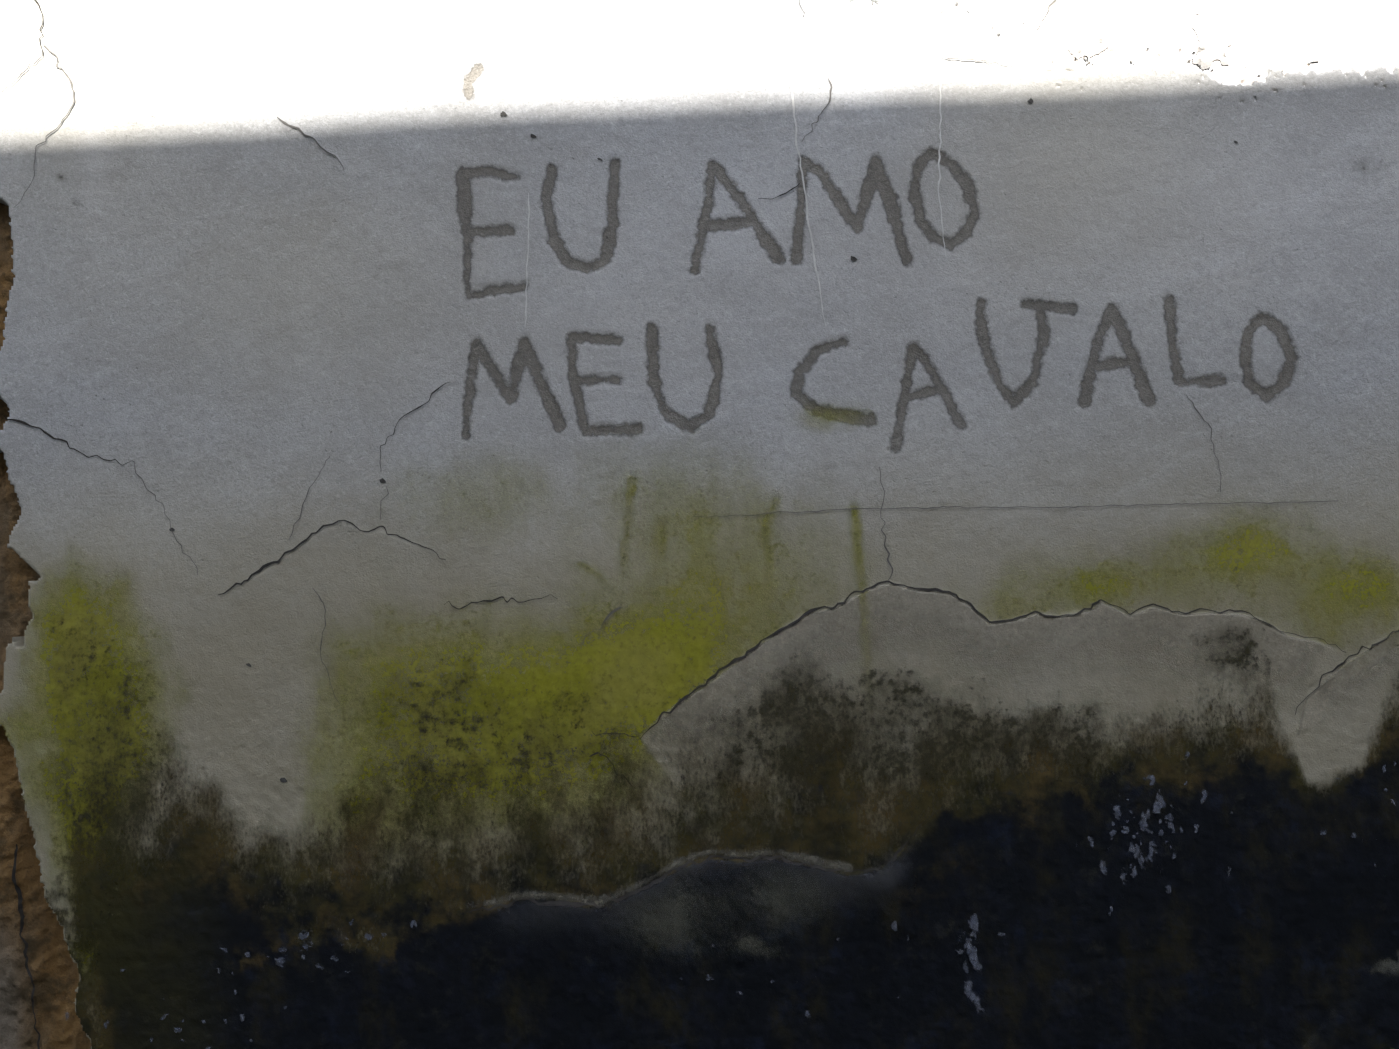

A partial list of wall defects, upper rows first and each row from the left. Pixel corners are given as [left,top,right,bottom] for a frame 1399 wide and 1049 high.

crack [2,0,75,206]
leakage [1242,0,1399,85]
spalling [0,203,15,351]
spalling [0,399,10,430]
spalling [0,452,41,693]
crack [4,382,450,595]
crack [444,595,558,609]
crack [589,396,1399,786]
leakage [1197,629,1270,669]
spalling [0,725,92,1049]
leakage [45,640,1399,1049]